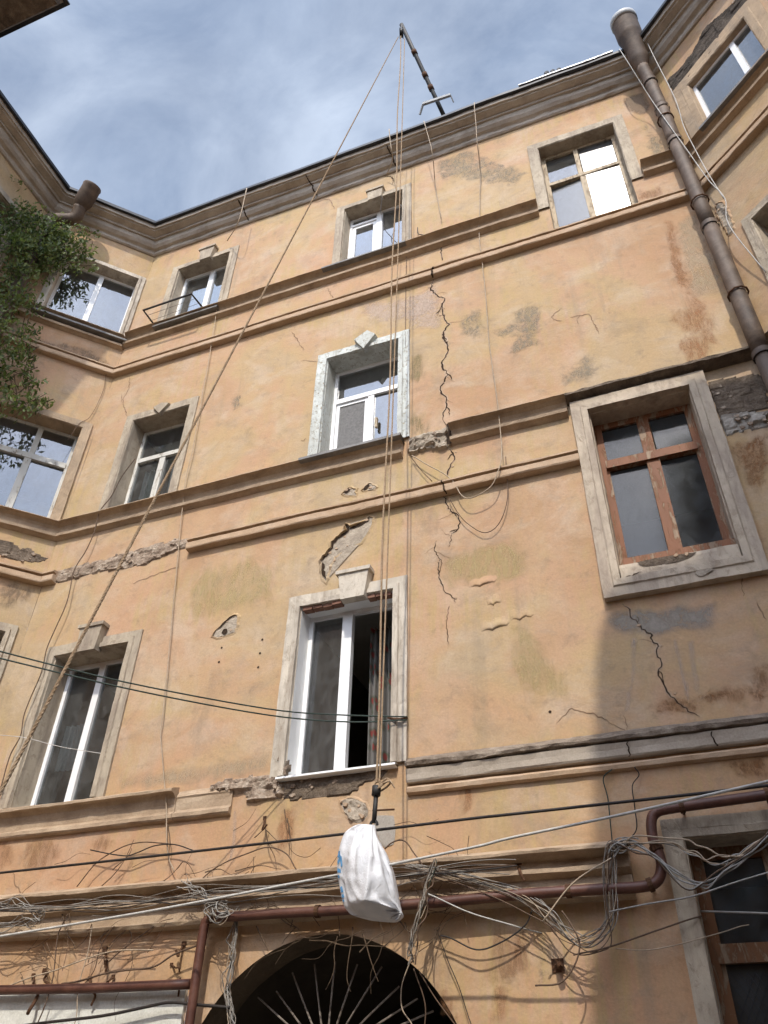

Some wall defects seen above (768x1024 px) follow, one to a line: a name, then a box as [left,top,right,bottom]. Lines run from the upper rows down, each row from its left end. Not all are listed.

spalling [708,374,768,430]
crack [426,247,461,647]
spalling [341,482,378,498]
spalling [0,540,48,563]
spalling [318,515,376,586]
spalling [210,613,241,640]
crack [623,604,718,746]
crack [560,708,634,761]
spalling [267,757,388,826]